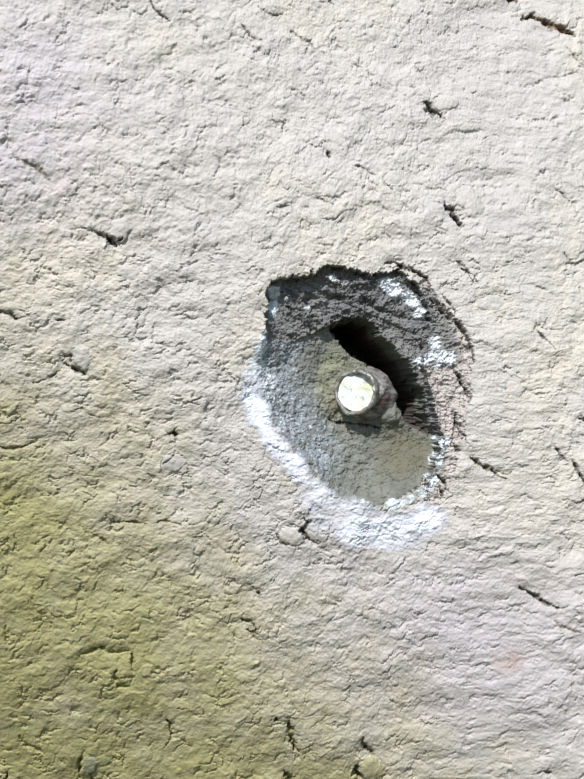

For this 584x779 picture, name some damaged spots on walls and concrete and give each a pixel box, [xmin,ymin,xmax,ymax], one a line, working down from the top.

crack [532,48,584,88]
spalling [456,261,479,284]
spalling [250,265,472,507]
crack [554,445,584,504]
crack [518,586,582,634]